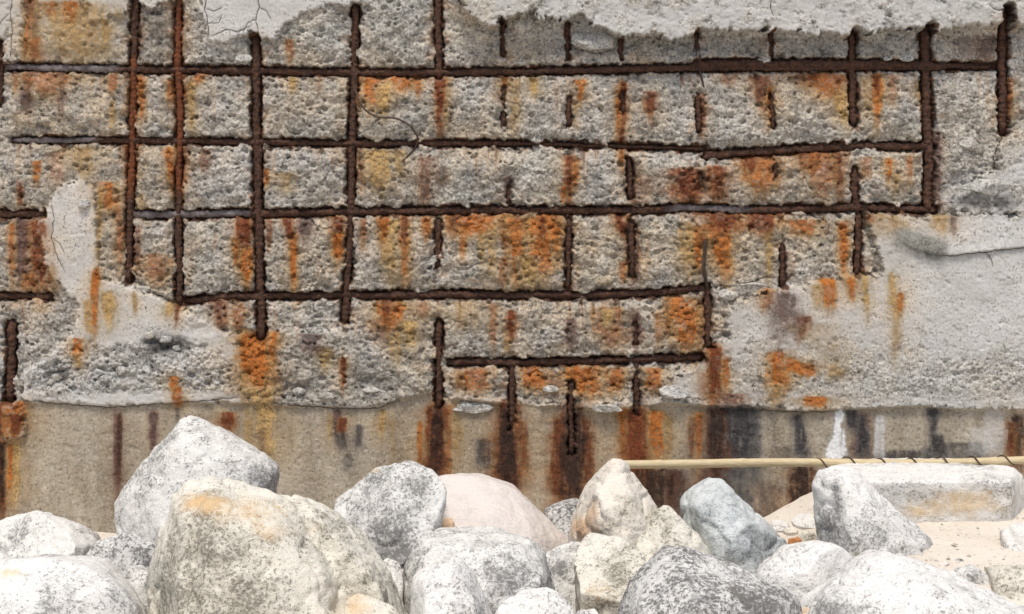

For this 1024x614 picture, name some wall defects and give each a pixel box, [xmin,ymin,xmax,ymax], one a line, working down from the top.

crack [204,0,271,39]
corrosion [72,148,164,368]
corrosion [445,213,565,289]
spalling [0,0,1024,414]
corrosion [669,150,869,338]
corrosion [214,301,278,458]
corrosion [417,403,463,476]
corrosion [490,401,528,489]
corrosion [520,364,626,501]
corrosion [616,407,674,477]
water stain [787,414,816,504]
water stain [825,408,984,459]